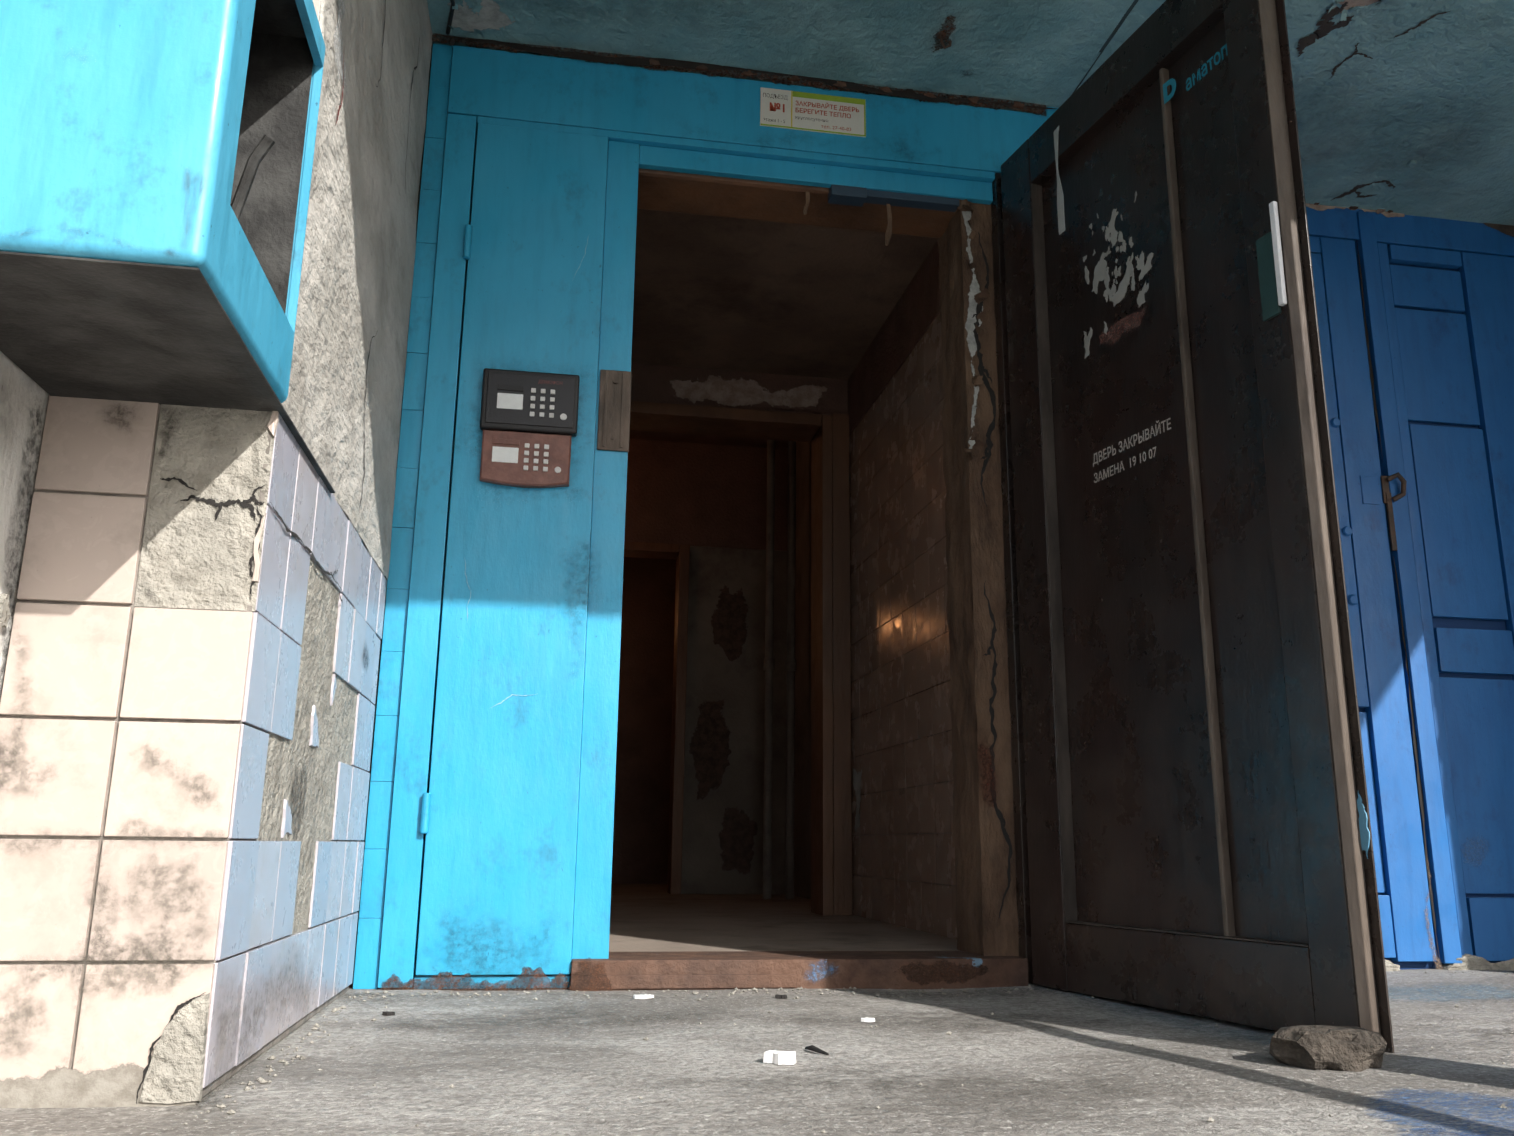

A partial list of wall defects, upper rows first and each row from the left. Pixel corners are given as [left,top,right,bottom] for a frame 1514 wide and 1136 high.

peeling [443,0,516,38]
spalling [1296,0,1392,57]
peeling [957,199,991,459]
peeling [669,375,828,409]
peeling [134,404,274,611]
crack [160,477,343,603]
peeling [711,586,748,661]
peeling [256,557,357,936]
peeling [689,700,731,800]
crack [984,581,1013,918]
corrosion [382,957,612,991]